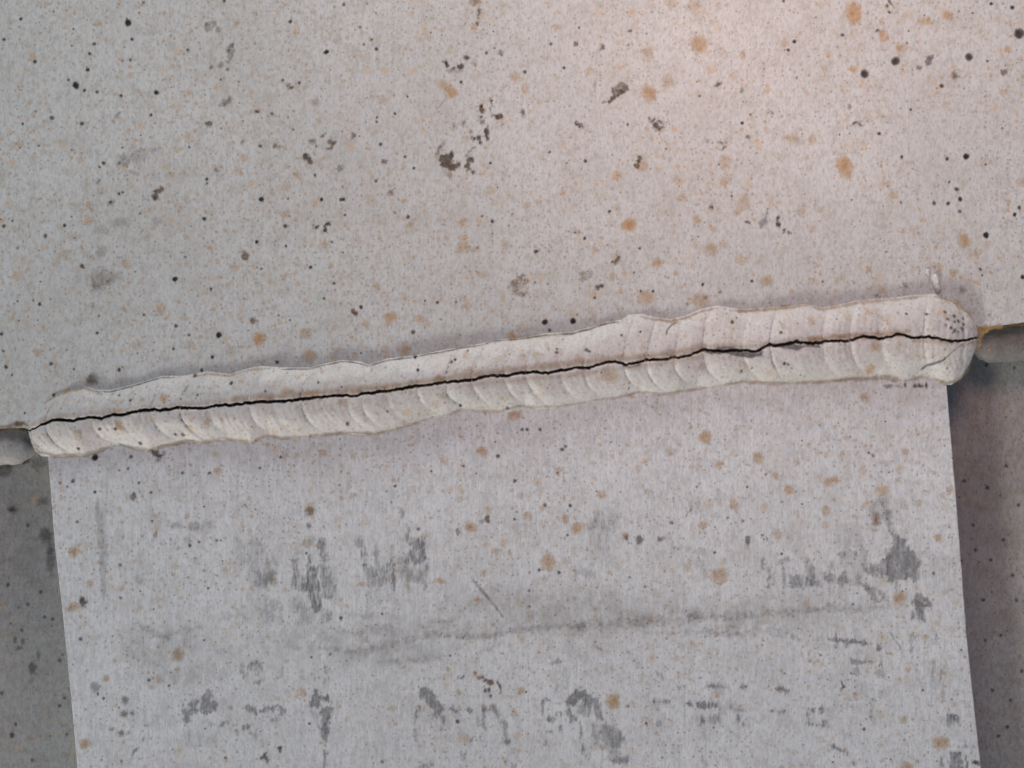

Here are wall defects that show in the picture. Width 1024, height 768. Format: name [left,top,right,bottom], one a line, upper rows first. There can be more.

crack [6,323,978,431]